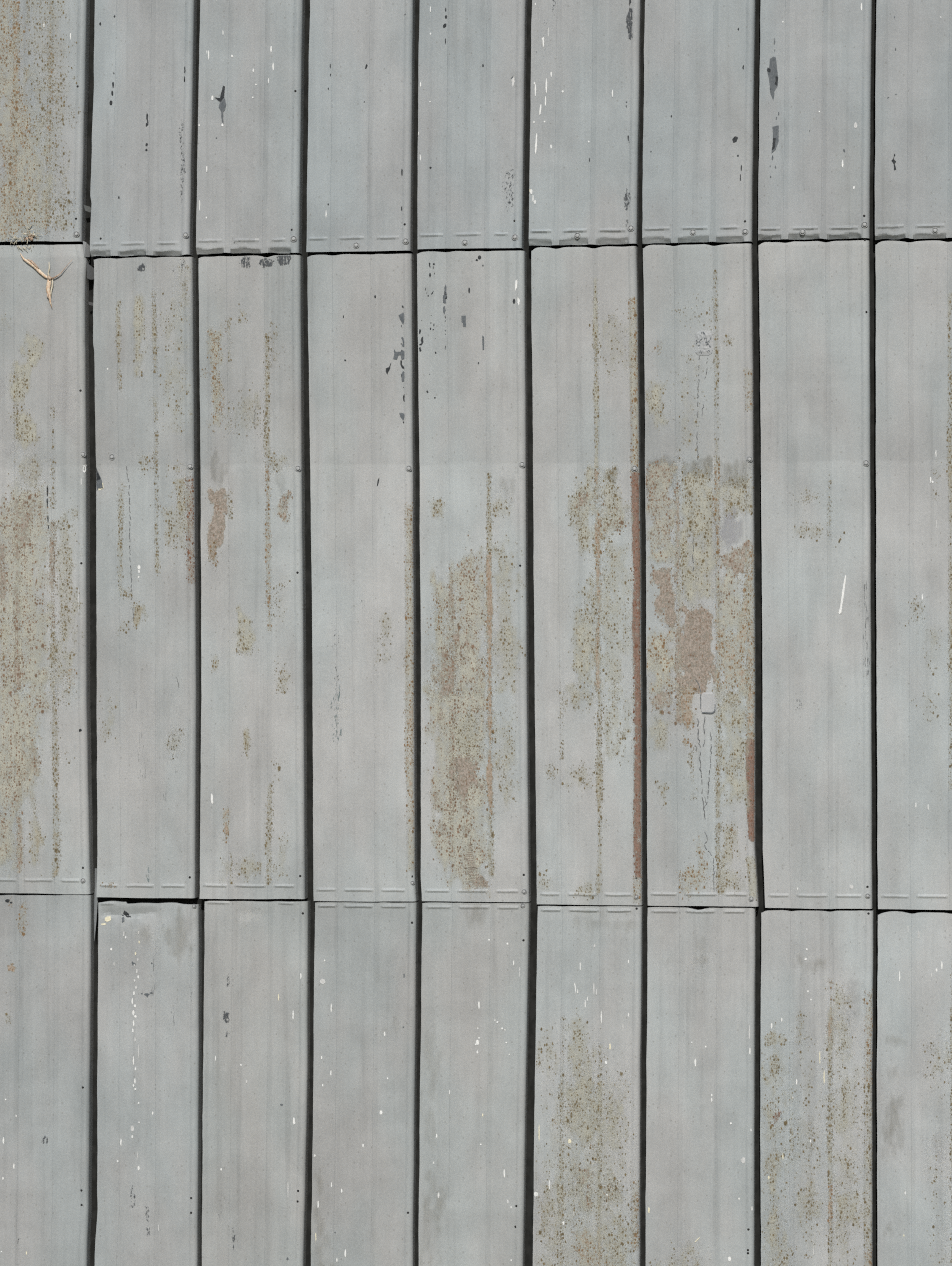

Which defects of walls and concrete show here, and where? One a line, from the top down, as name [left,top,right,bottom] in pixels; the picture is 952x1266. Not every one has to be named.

rust [0,0,81,242]
rust [0,334,83,879]
rust [117,483,146,636]
rust [114,259,234,584]
rust [202,303,293,655]
rust [374,473,526,898]
rust [539,270,758,904]
rust [536,1008,699,1266]
rust [761,978,873,1266]